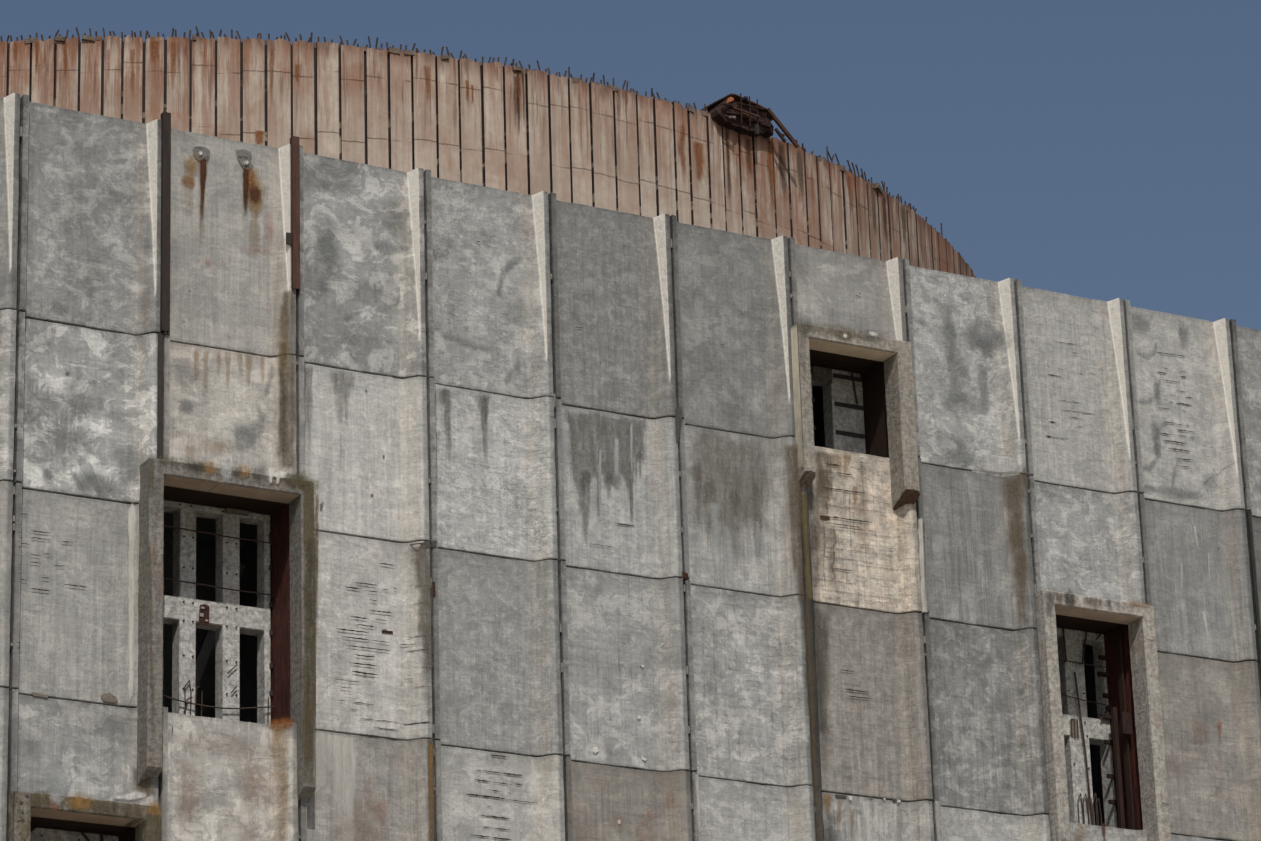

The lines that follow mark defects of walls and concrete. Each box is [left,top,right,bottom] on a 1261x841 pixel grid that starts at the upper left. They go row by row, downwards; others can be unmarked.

corrosion [182,157,206,215]
corrosion [243,169,262,210]
leakage [568,413,642,524]
efflorescence [919,519,927,612]